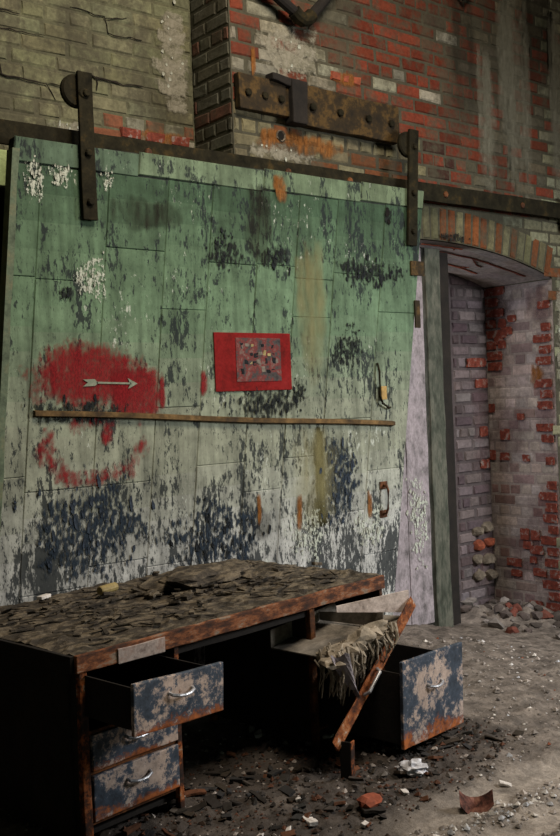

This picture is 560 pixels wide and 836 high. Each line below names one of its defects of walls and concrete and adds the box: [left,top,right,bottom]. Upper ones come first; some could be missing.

crack [0,8,45,36]
crack [73,7,142,41]
crack [0,64,60,100]
crack [78,70,144,90]
corrosion [260,129,333,157]
peeling [23,155,72,203]
spalling [466,286,516,388]
spalling [533,287,560,410]
spalling [536,423,554,443]
peeling [281,434,386,563]
peeling [25,463,271,583]
spalling [507,481,560,612]